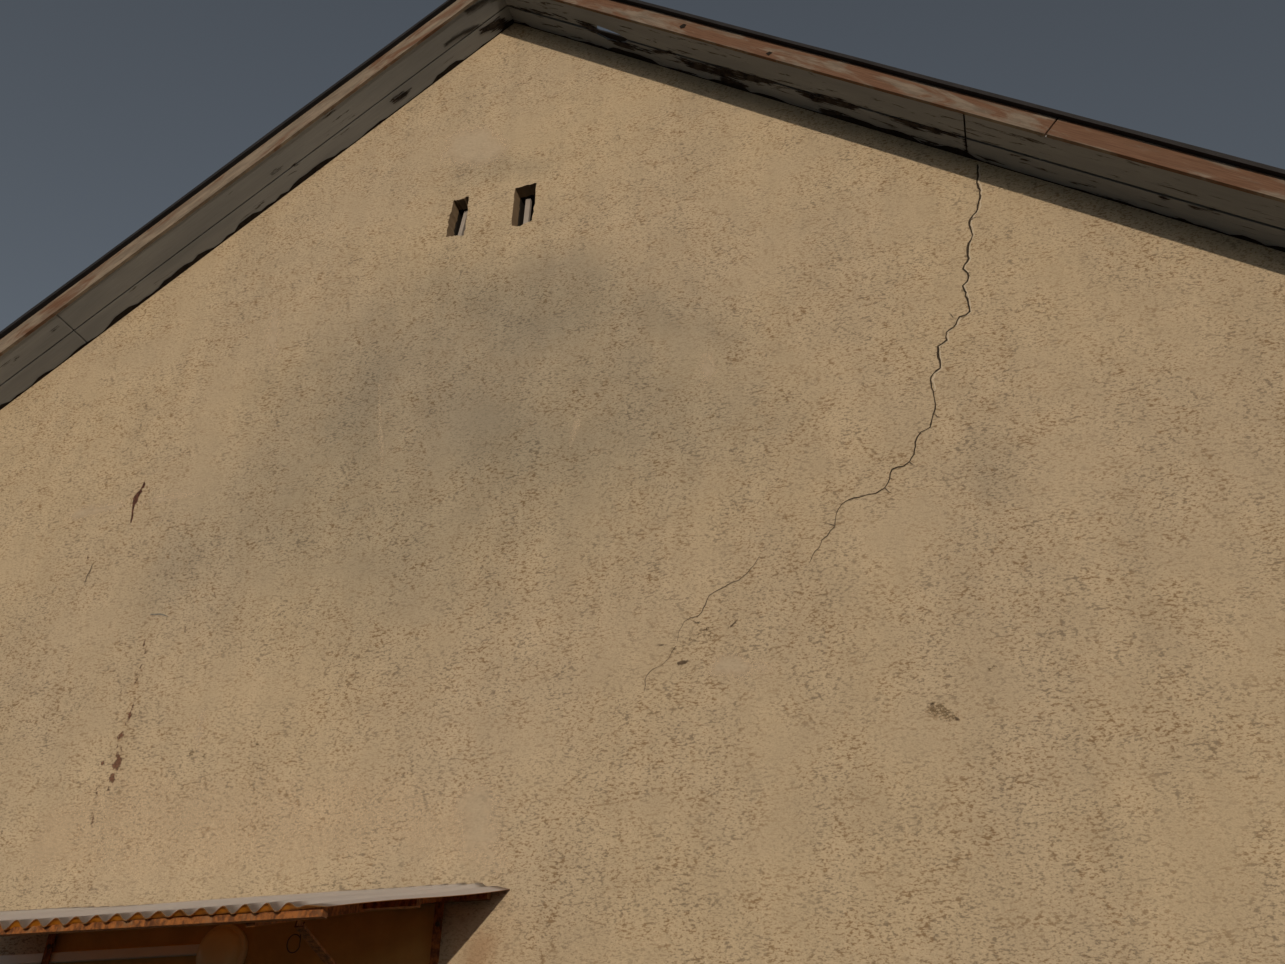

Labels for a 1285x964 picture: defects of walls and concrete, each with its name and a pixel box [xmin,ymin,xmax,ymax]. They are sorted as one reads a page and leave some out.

peeling [0,0,1285,410]
crack [809,164,983,563]
corrosion [96,704,134,794]
crack [644,557,759,691]